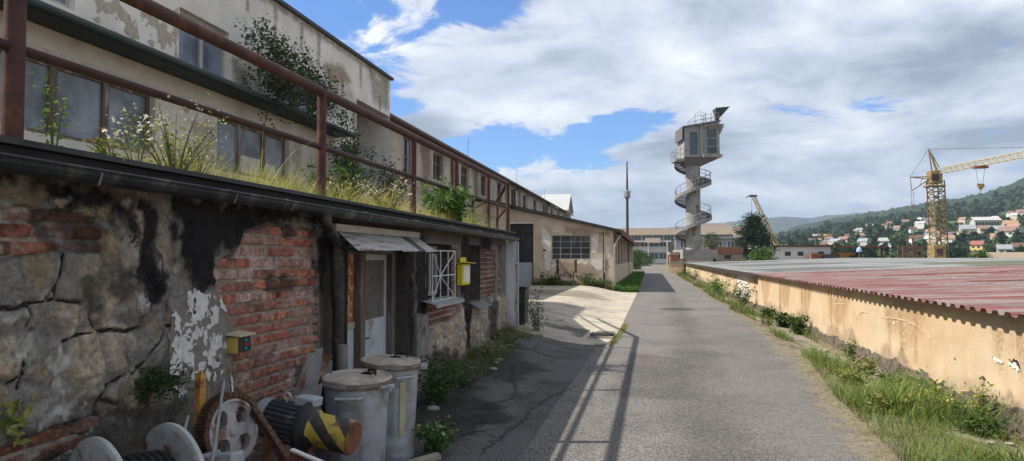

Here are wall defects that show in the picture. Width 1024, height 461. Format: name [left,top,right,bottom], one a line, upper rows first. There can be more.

peeling [93,0,179,58]
damp [170,222,213,294]
peeling [533,227,612,287]
crack [0,251,137,342]
flaking render [167,224,319,405]
crack [8,360,26,389]
crack [69,304,171,423]
spalling [991,355,1021,371]
flaking render [237,408,263,453]